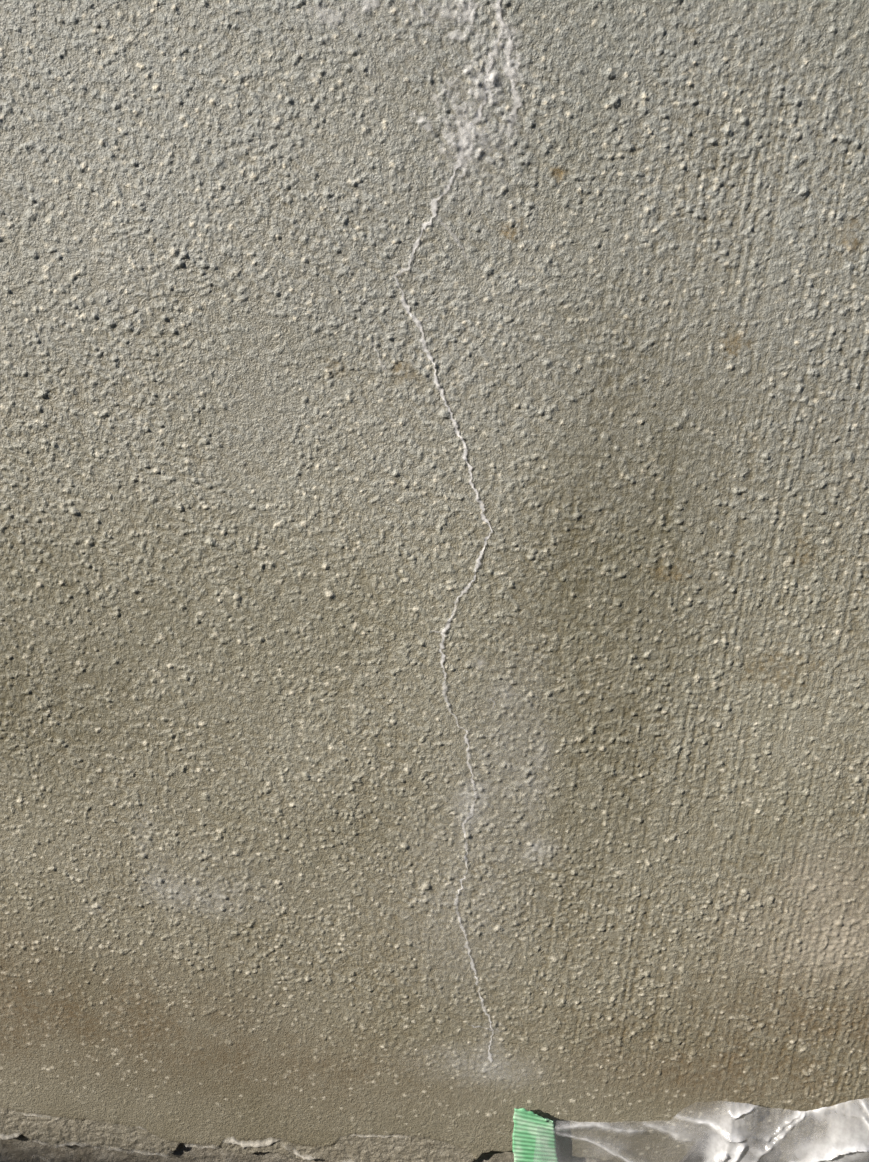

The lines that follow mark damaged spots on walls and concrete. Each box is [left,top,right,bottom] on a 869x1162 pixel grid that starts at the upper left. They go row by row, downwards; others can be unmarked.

leakage [449,0,477,39]
leakage [442,29,520,174]
crack [394,0,521,1063]
peeling [228,1138,276,1149]